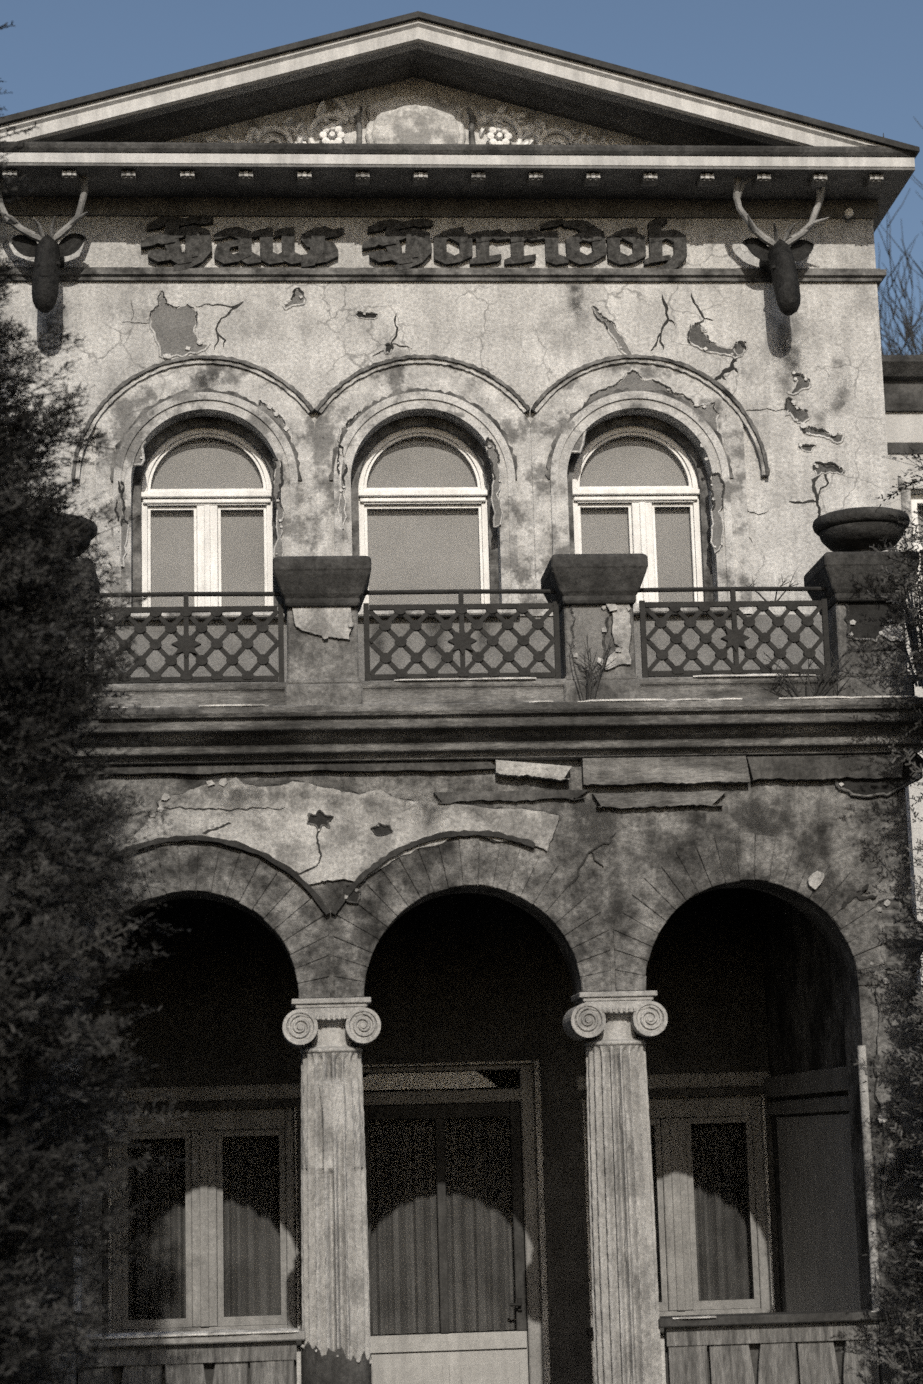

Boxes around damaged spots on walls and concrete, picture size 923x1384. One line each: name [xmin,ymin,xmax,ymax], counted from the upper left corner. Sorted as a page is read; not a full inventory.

spalling [149,290,210,359]
crack [196,301,244,350]
crack [373,315,412,356]
spalling [582,306,720,432]
crack [650,293,713,351]
spalling [686,322,748,359]
spalling [784,371,846,477]
peeling [700,443,725,553]
spalling [570,604,632,674]
crack [157,806,285,834]
crack [296,831,322,875]
peeling [129,777,560,904]